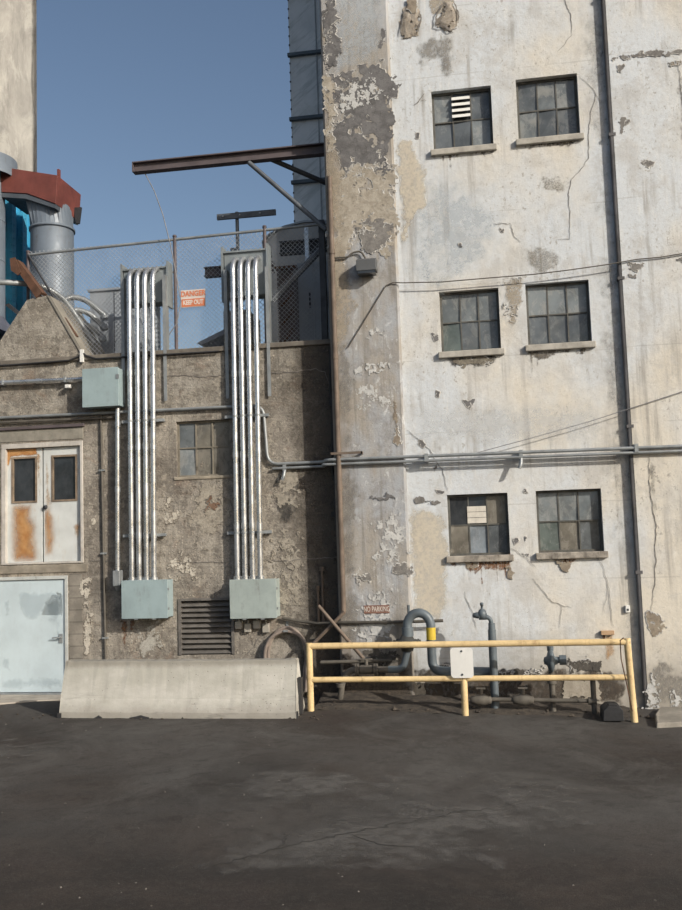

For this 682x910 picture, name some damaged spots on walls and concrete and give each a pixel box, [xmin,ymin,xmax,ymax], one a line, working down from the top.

spalling [399,0,422,39]
spalling [430,0,460,32]
peeling [321,0,402,271]
crack [559,77,600,240]
corrosion [7,449,39,468]
corrosion [15,508,34,559]
peeling [372,542,414,577]
crack [212,804,513,866]